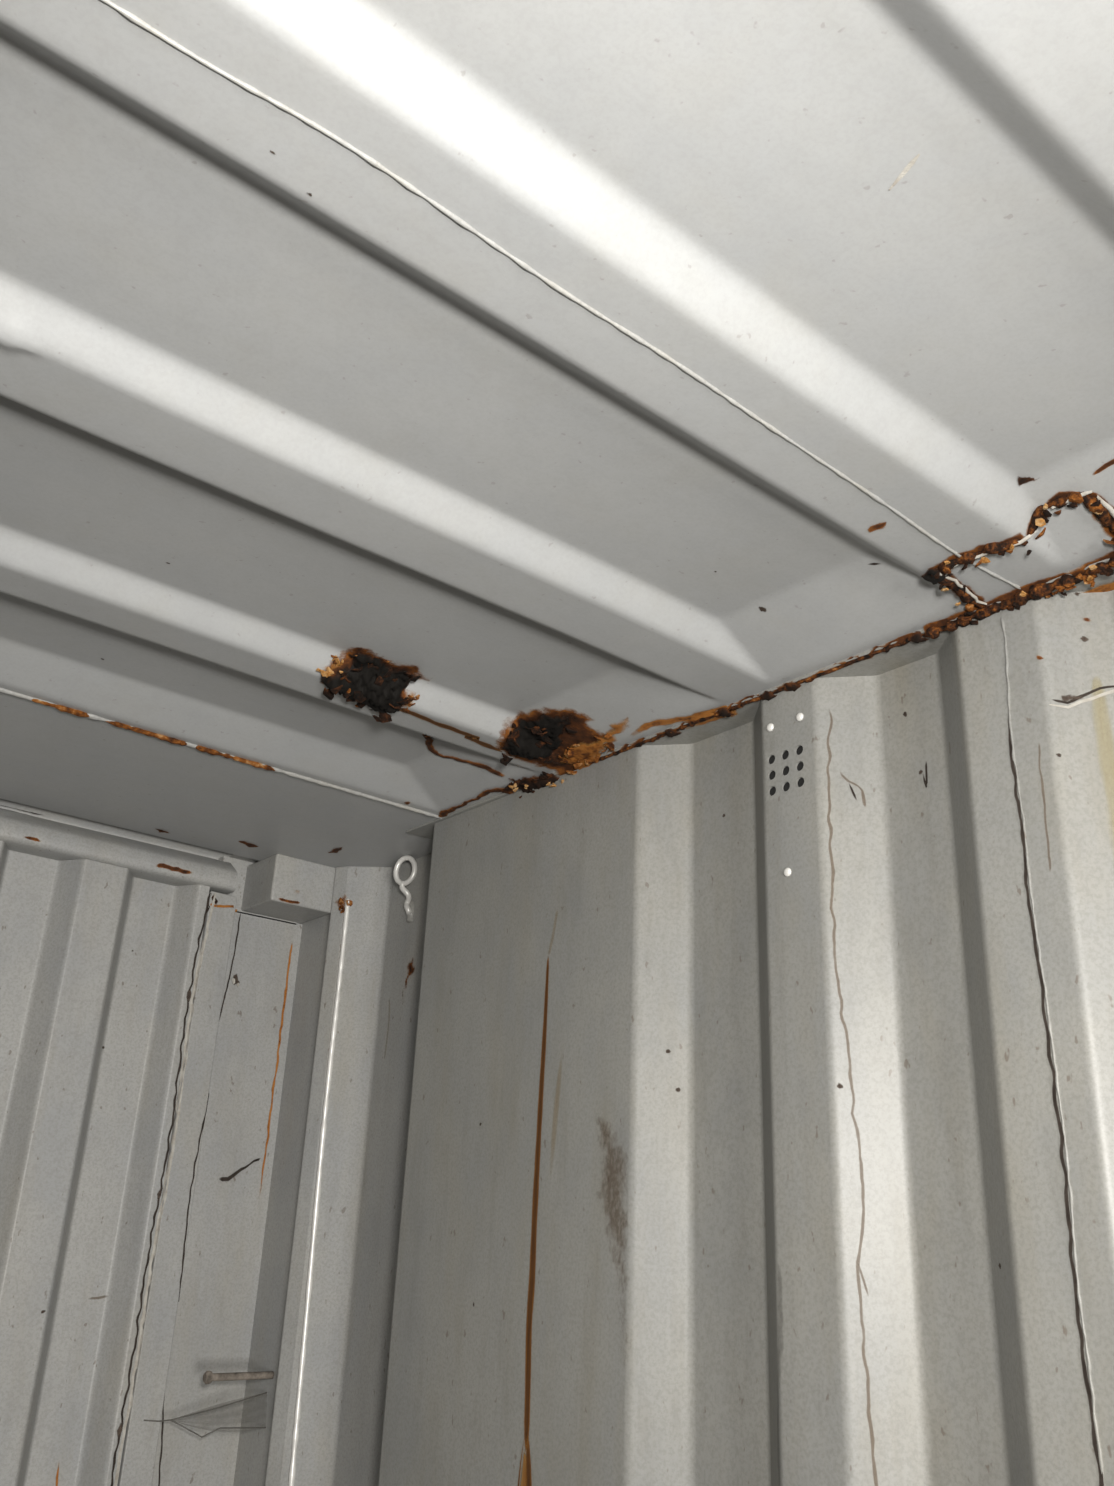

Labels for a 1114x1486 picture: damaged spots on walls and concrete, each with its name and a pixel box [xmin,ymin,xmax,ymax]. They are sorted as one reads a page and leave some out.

rust [316,459,1114,817]
rust [518,957,549,1486]